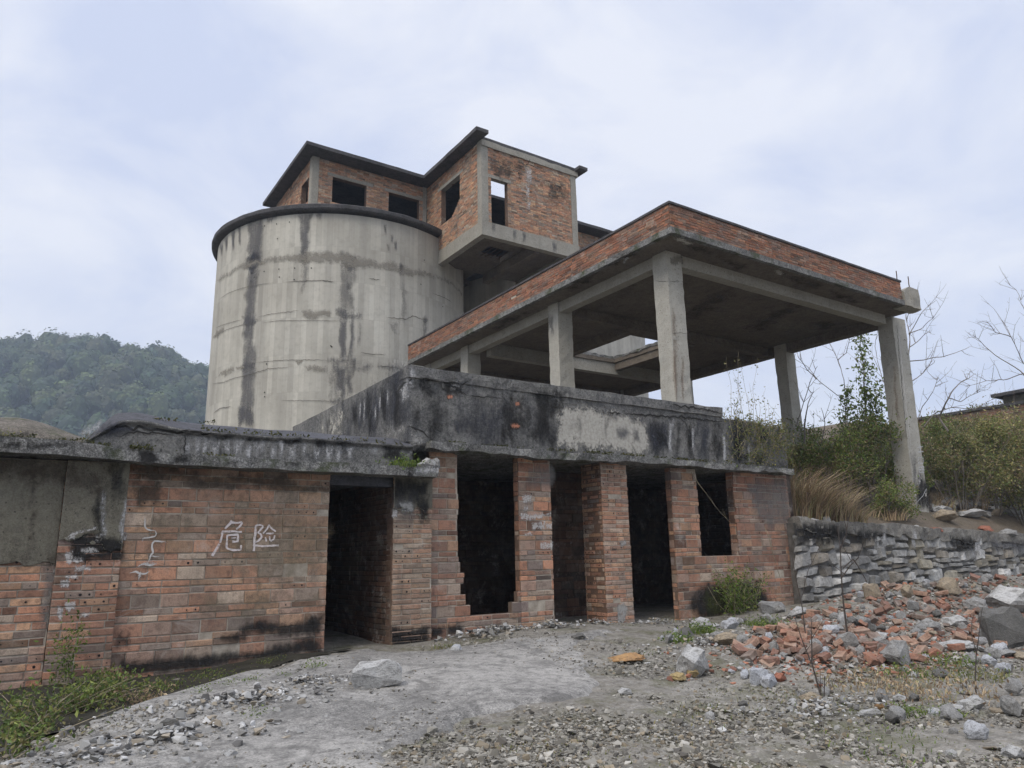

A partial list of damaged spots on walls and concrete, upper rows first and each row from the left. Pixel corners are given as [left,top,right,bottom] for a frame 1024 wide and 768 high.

leakage [221,220,263,423]
leakage [186,254,419,459]
leakage [429,391,563,446]
leakage [646,420,763,461]
flaking render [61,527,127,587]
flaking render [57,602,90,619]